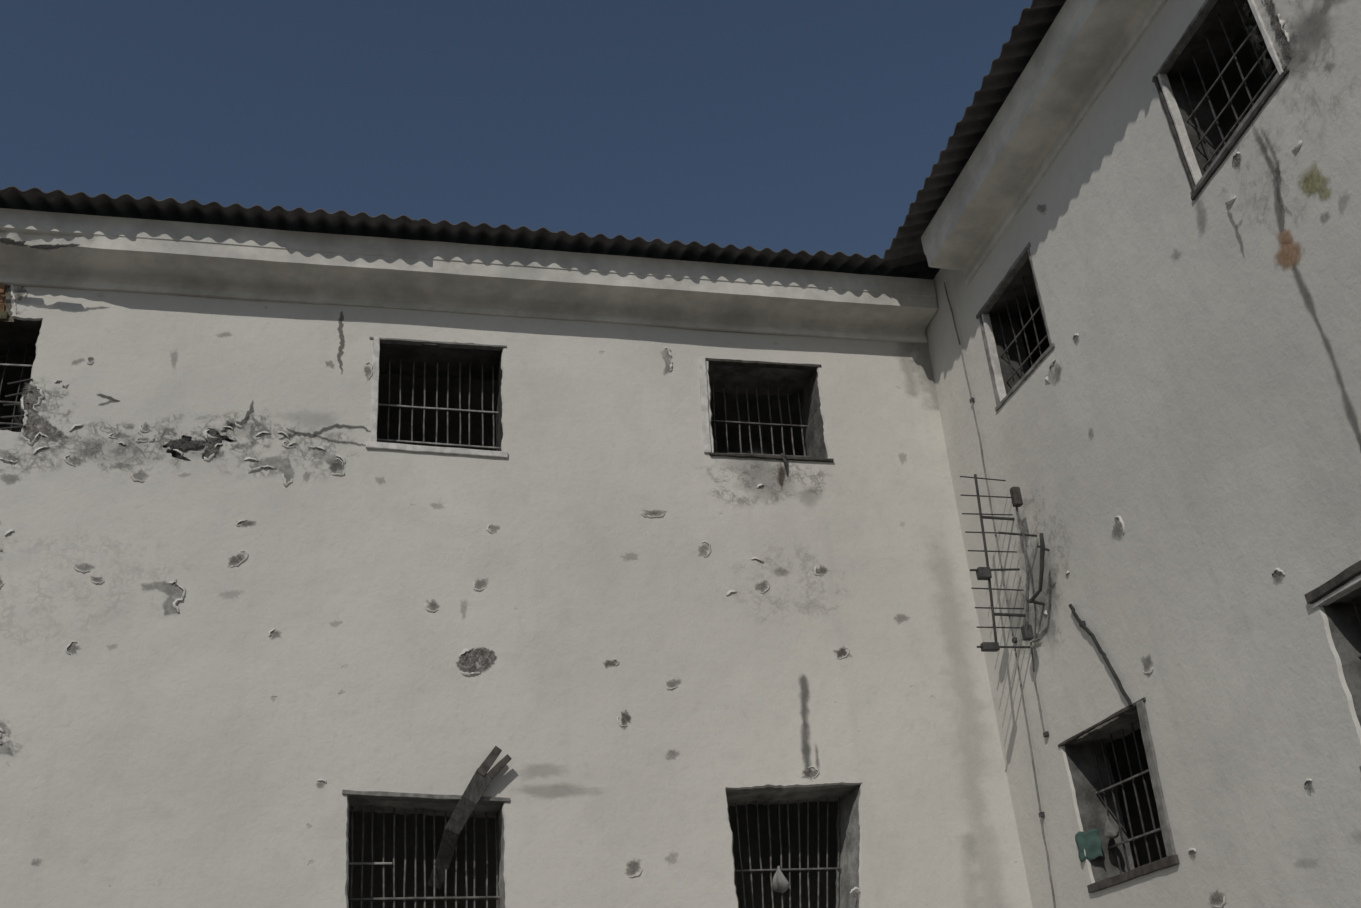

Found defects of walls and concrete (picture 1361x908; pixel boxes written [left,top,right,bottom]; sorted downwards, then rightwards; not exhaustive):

rust [1277,230,1299,268]
flaking render [0,284,28,322]
crack [337,311,345,374]
spalling [20,380,83,467]
peeling [203,422,346,477]
spalling [243,457,293,488]
spalling [457,647,497,677]